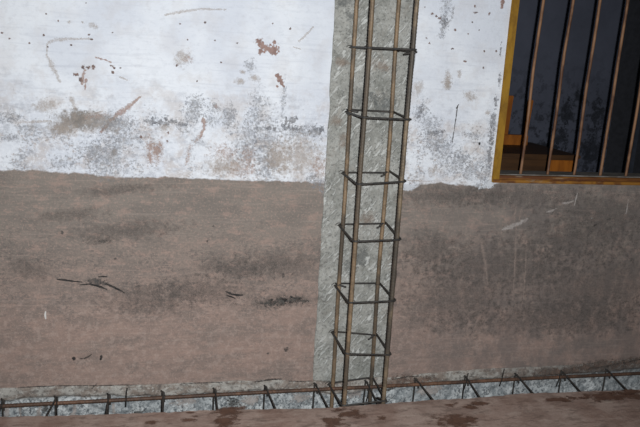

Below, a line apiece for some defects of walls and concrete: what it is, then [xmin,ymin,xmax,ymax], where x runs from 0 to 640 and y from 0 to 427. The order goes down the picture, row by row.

water stain [52,96,141,134]
spalling [0,0,415,417]
spalling [385,357,640,404]